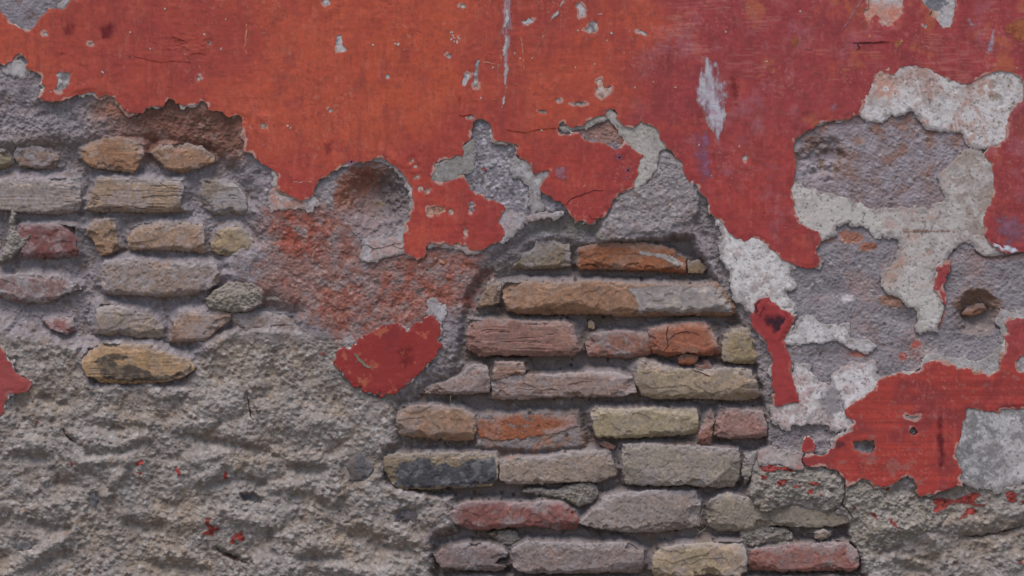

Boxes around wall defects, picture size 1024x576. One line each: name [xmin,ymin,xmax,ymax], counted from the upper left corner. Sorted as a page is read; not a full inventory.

flaking render [0,0,71,36]
flaking render [0,56,506,396]
flaking render [382,60,1024,576]